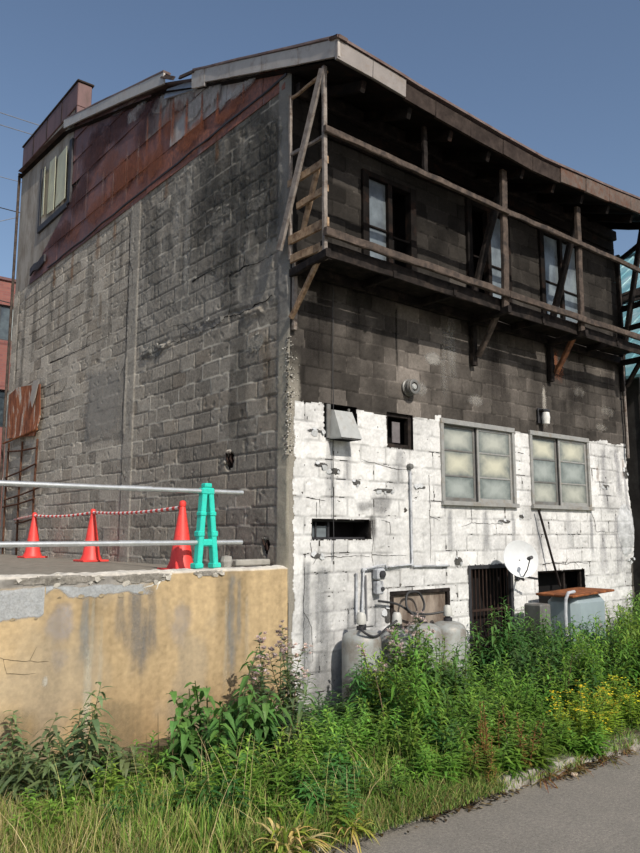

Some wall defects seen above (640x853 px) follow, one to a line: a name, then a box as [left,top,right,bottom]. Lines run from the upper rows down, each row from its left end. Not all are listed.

rust [172,93,203,151]
peeling [129,78,254,122]
crack [192,254,273,282]
crack [210,295,272,329]
peeling [0,573,171,622]
crack [303,520,406,669]